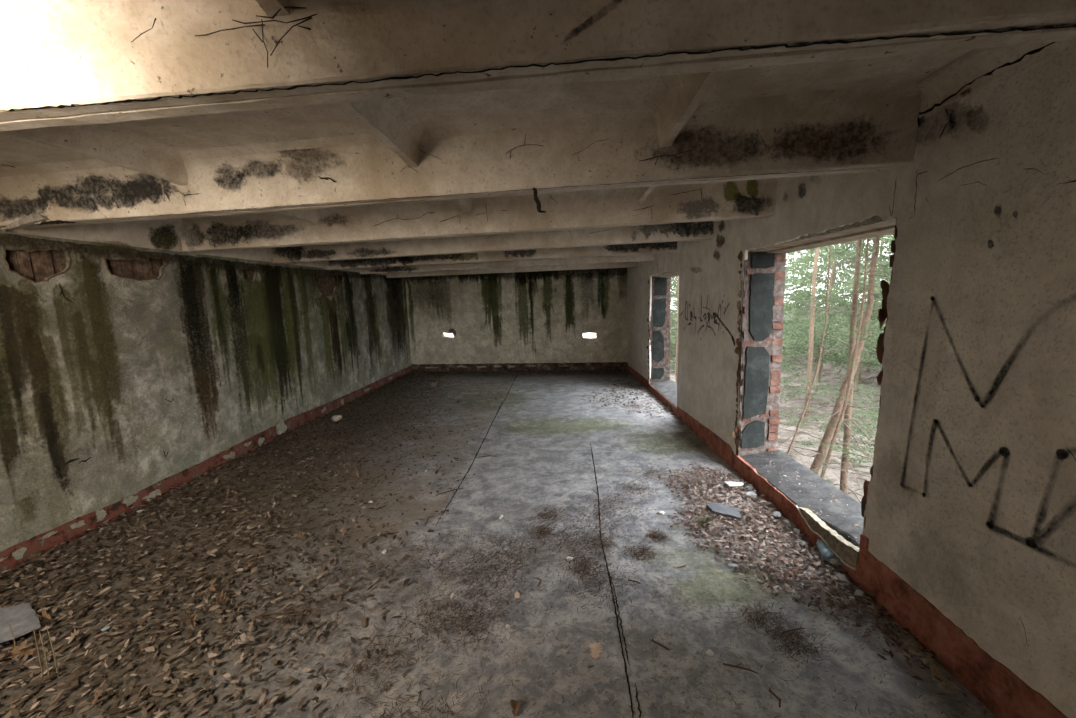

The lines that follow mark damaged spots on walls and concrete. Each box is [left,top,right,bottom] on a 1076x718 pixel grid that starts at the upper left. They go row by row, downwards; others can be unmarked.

water stain [949,23,1076,34]
crack [0,26,1076,138]
water stain [774,121,892,162]
water stain [216,148,336,189]
water stain [0,173,171,221]
water stain [724,180,770,216]
water stain [0,220,628,486]
flaking render [876,280,889,385]
peeling [222,437,265,459]
peeling [123,489,161,506]
flaking render [861,465,874,528]
peeling [70,509,107,529]